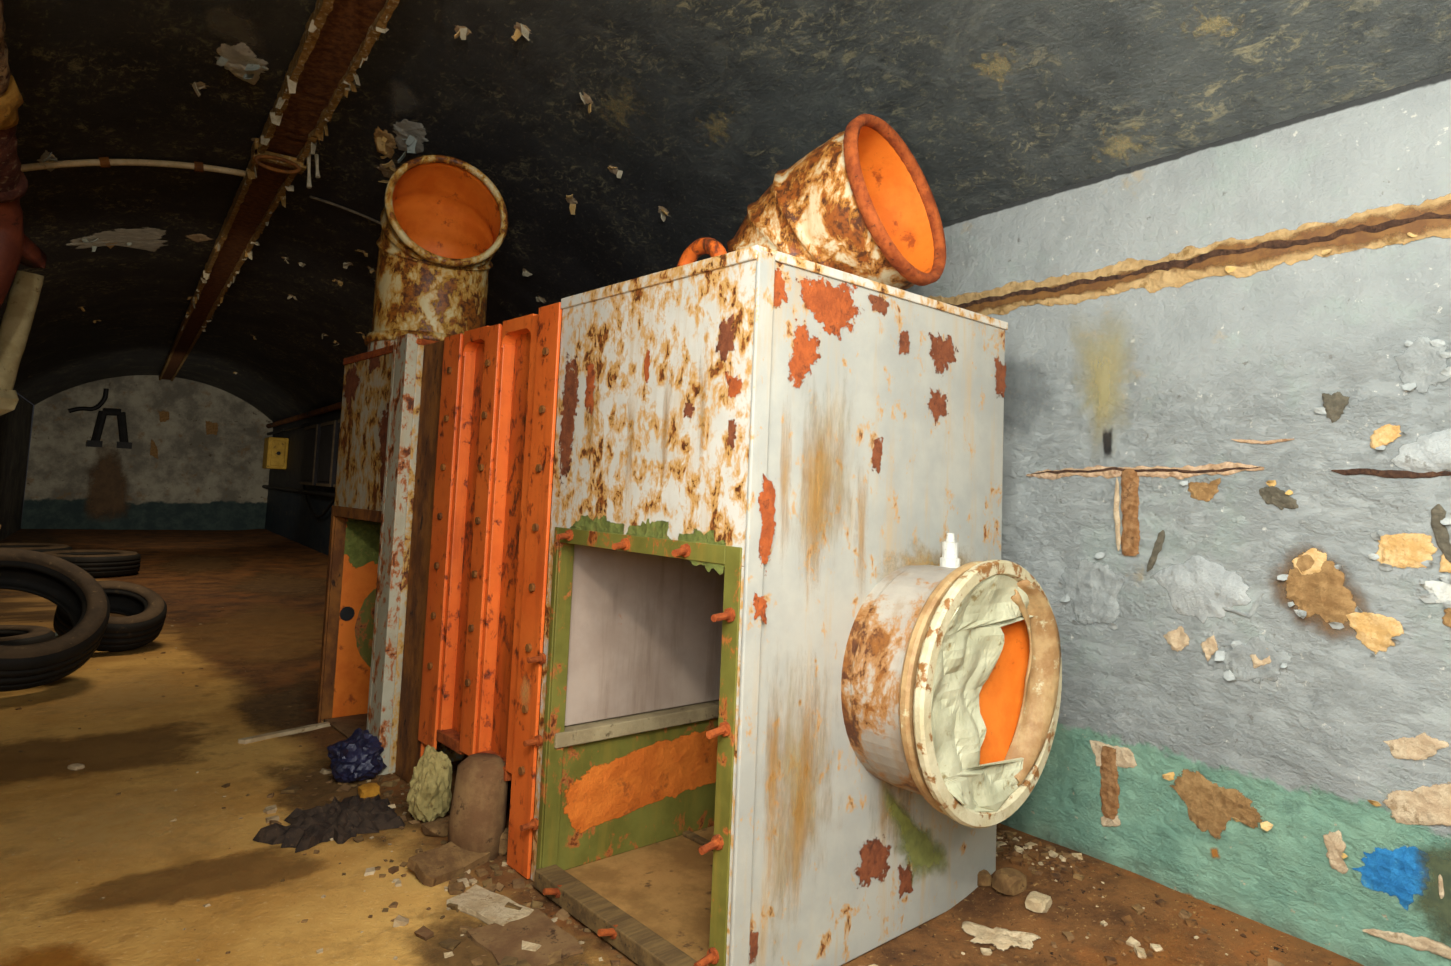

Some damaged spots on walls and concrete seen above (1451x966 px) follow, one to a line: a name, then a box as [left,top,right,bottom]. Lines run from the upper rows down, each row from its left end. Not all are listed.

peeling [207,7,269,85]
peeling [66,227,168,252]
spalling [928,193,1451,316]
peeling [1394,336,1451,394]
spalling [1274,548,1404,657]
spalling [1368,518,1451,628]
peeling [1383,732,1449,760]
spalling [1162,769,1273,839]
spalling [1367,782,1451,826]
peeling [1323,830,1429,910]
water stain [1418,848,1451,944]
peeling [1363,929,1451,959]